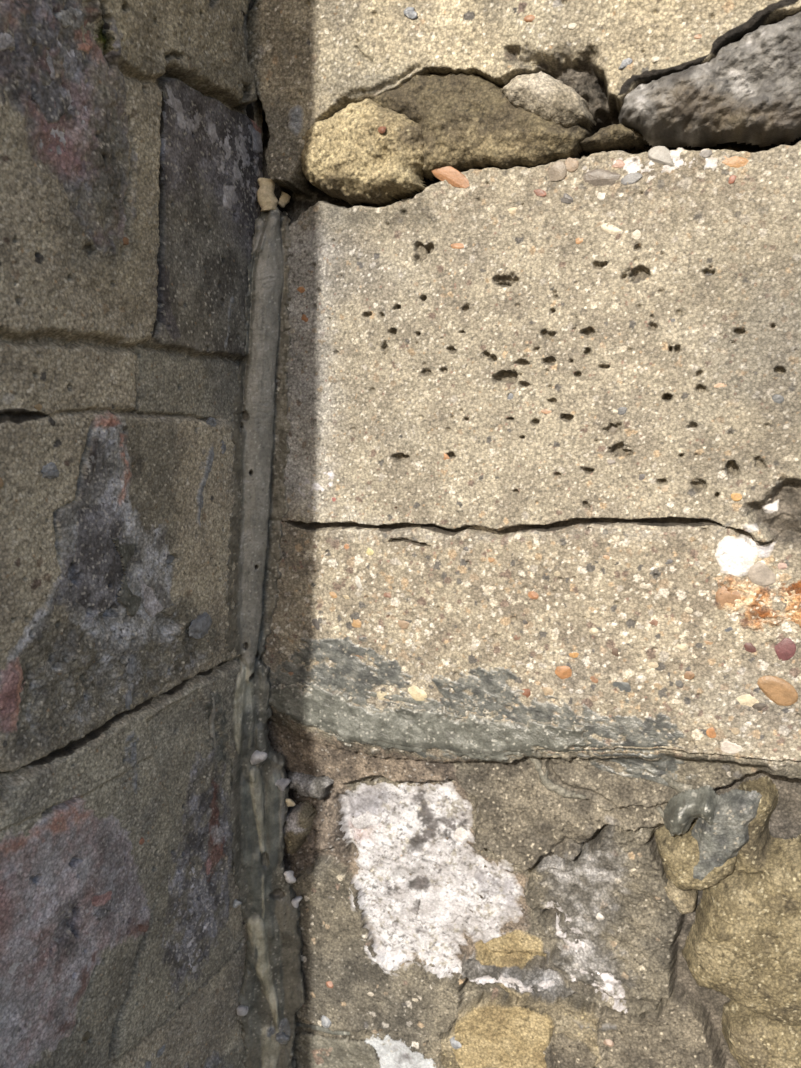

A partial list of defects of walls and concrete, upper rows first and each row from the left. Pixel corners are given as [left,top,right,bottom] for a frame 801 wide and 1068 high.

crack [617,0,799,96]
crack [246,103,255,122]
crack [0,408,49,424]
spalling [0,409,184,740]
crack [282,517,801,547]
crack [0,660,230,774]